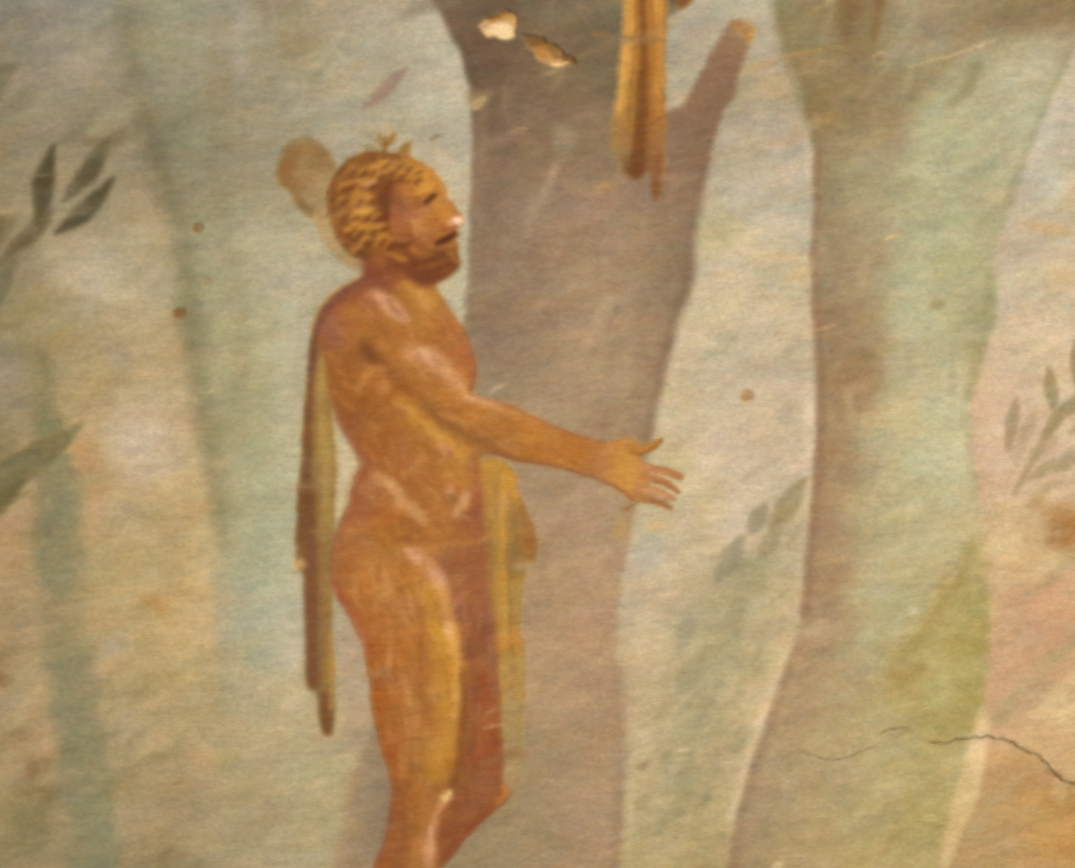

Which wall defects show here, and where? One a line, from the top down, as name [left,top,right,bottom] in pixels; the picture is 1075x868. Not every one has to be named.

flaking render [480,11,575,75]
crack [805,728,1075,785]